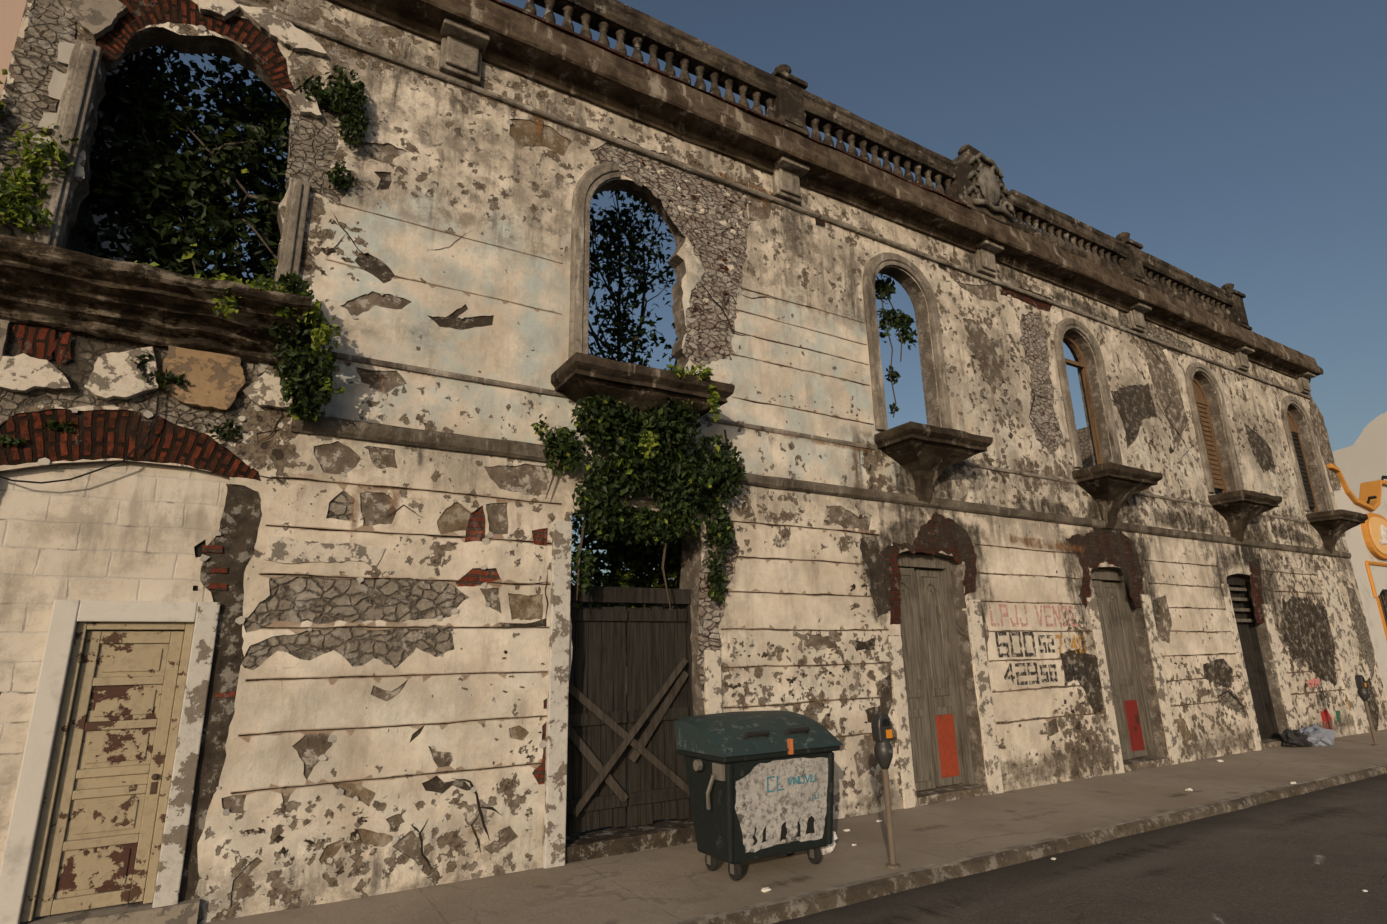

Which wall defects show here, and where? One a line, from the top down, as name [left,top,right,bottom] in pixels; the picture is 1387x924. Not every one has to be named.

spalling [507,119,572,156]
flaking render [590,137,772,368]
flaking render [0,323,266,434]
spalling [437,463,549,545]
flaking render [199,531,228,591]
leakage [1064,496,1212,634]
spalling [235,565,546,701]
flaking render [215,691,235,700]